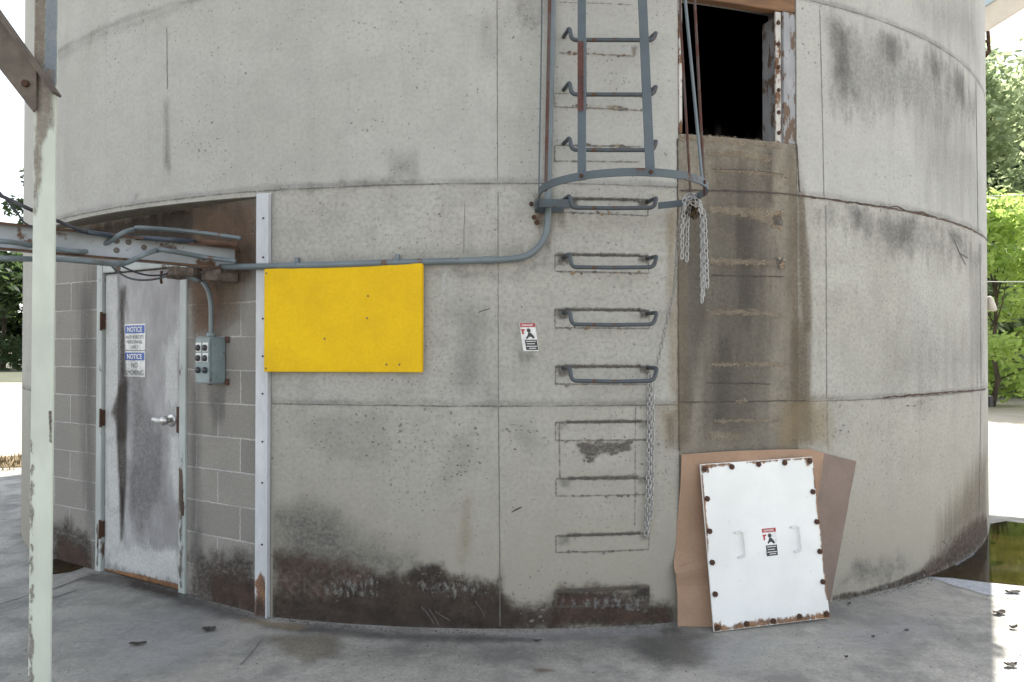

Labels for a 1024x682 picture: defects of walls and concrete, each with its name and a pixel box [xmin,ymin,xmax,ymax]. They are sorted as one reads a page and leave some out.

damp [118,385,160,537]
spalling [577,440,633,463]
damp [53,521,255,617]
rust [254,572,265,616]
damp [273,514,703,663]